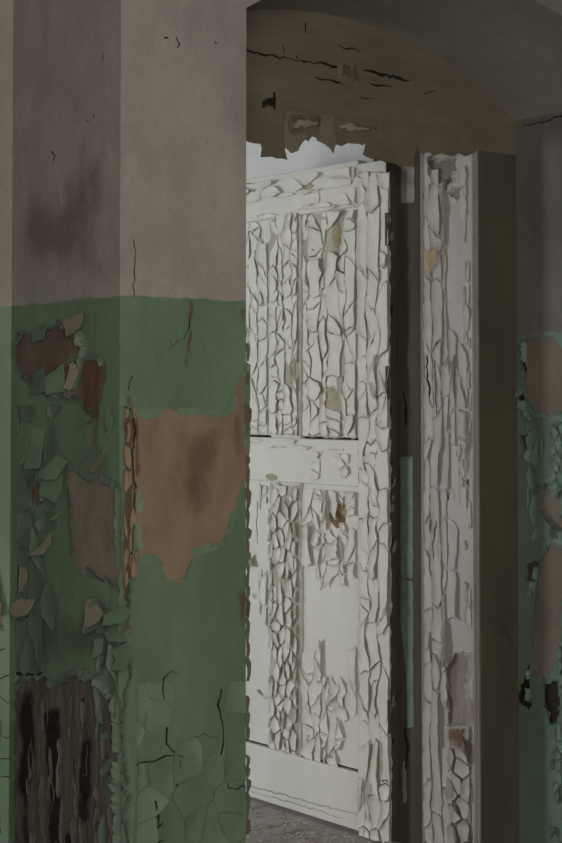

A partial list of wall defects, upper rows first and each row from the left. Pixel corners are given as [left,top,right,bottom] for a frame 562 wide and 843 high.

crack [246,44,409,100]
peeling [0,92,477,843]
peeling [515,330,562,819]
leakage [18,694,34,804]
leakage [44,709,71,843]
leakage [79,739,91,823]
crack [135,727,184,787]
crack [155,801,164,843]
crack [195,690,224,755]